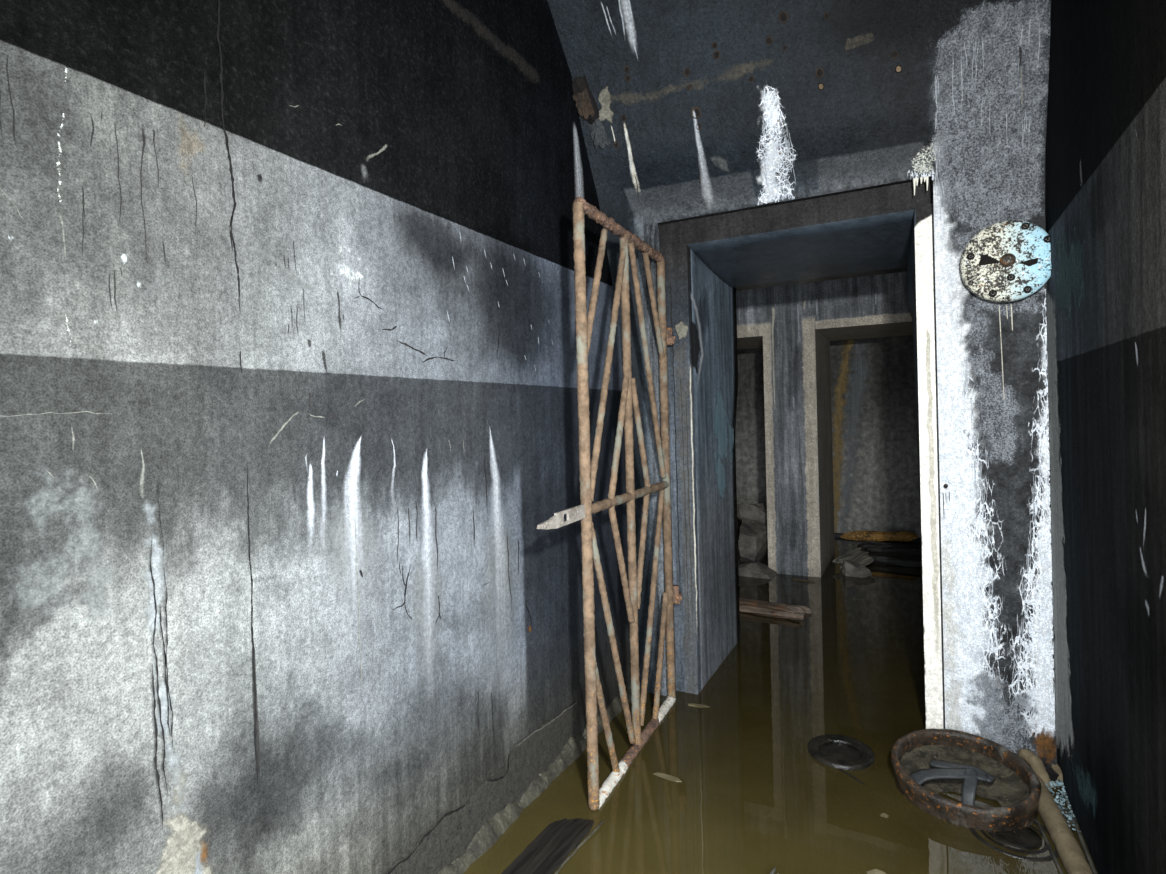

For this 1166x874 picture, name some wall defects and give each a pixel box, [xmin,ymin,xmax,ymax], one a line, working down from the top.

leakage [602,0,636,52]
crack [204,0,240,307]
leakage [757,86,796,205]
leakage [907,0,1074,757]
leakage [309,438,361,519]
leakage [340,520,358,562]
leakage [397,452,438,593]
leakage [484,431,498,511]
leakage [497,538,519,607]
crack [146,485,178,826]